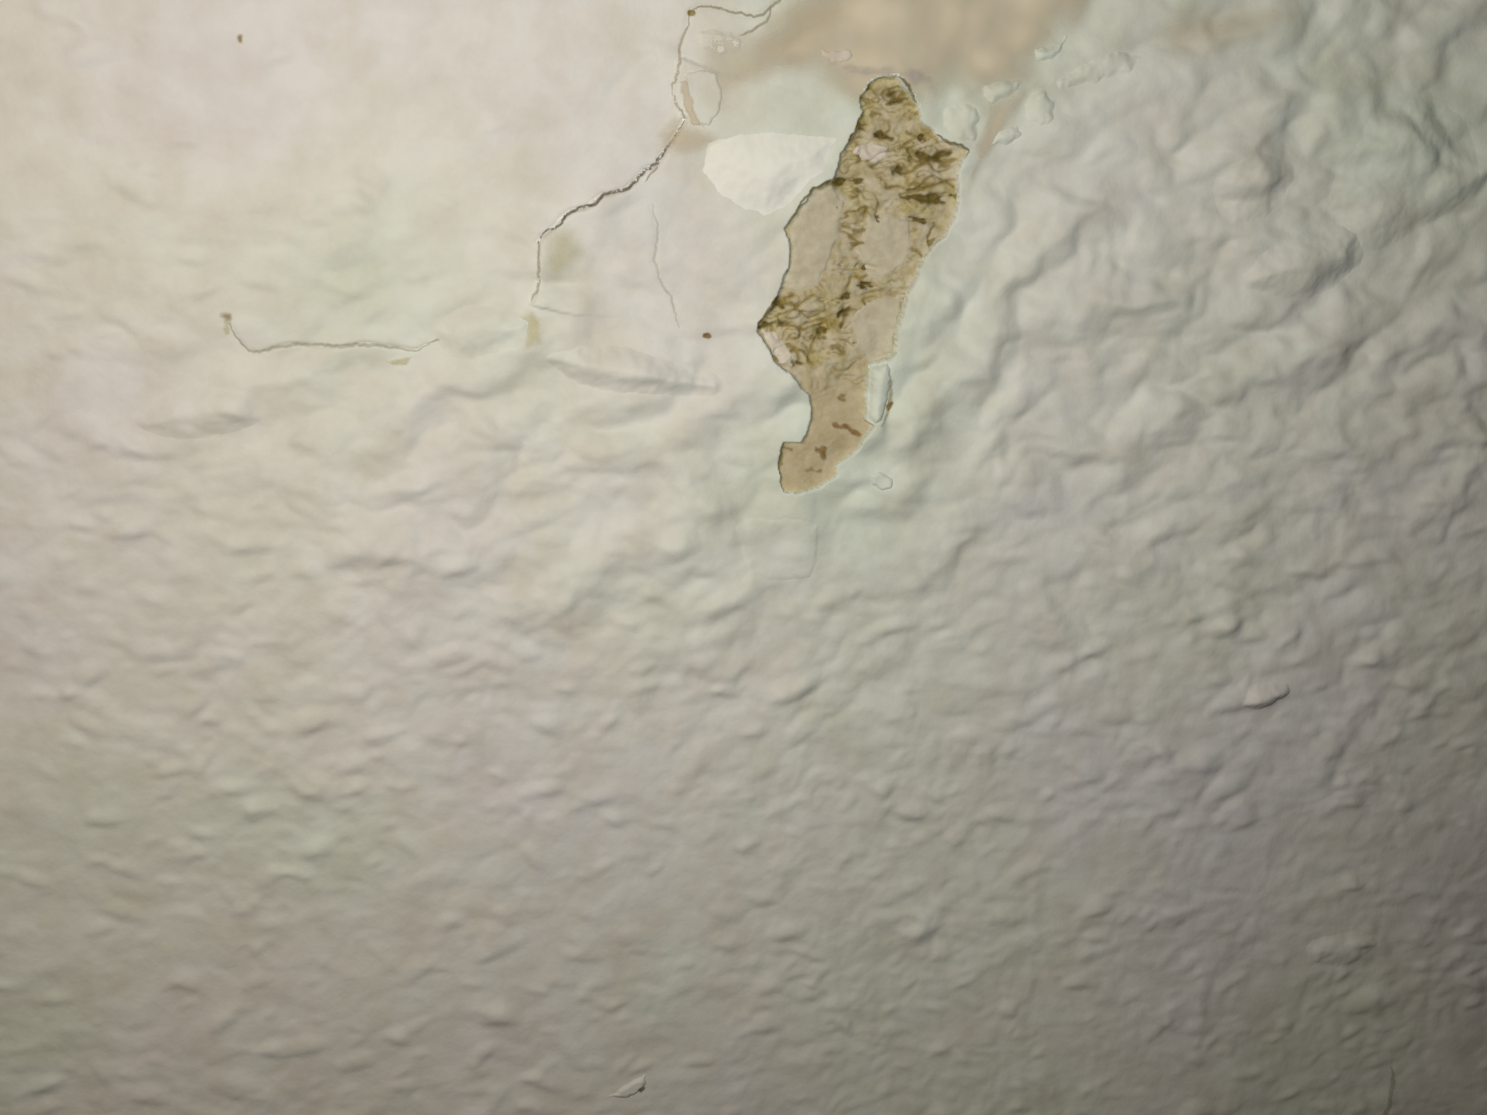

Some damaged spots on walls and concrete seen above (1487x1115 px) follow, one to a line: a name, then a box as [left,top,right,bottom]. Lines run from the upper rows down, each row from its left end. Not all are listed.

crack [688,0,781,36]
damp [764,0,1142,155]
crack [538,120,685,243]
spalling [757,76,970,492]